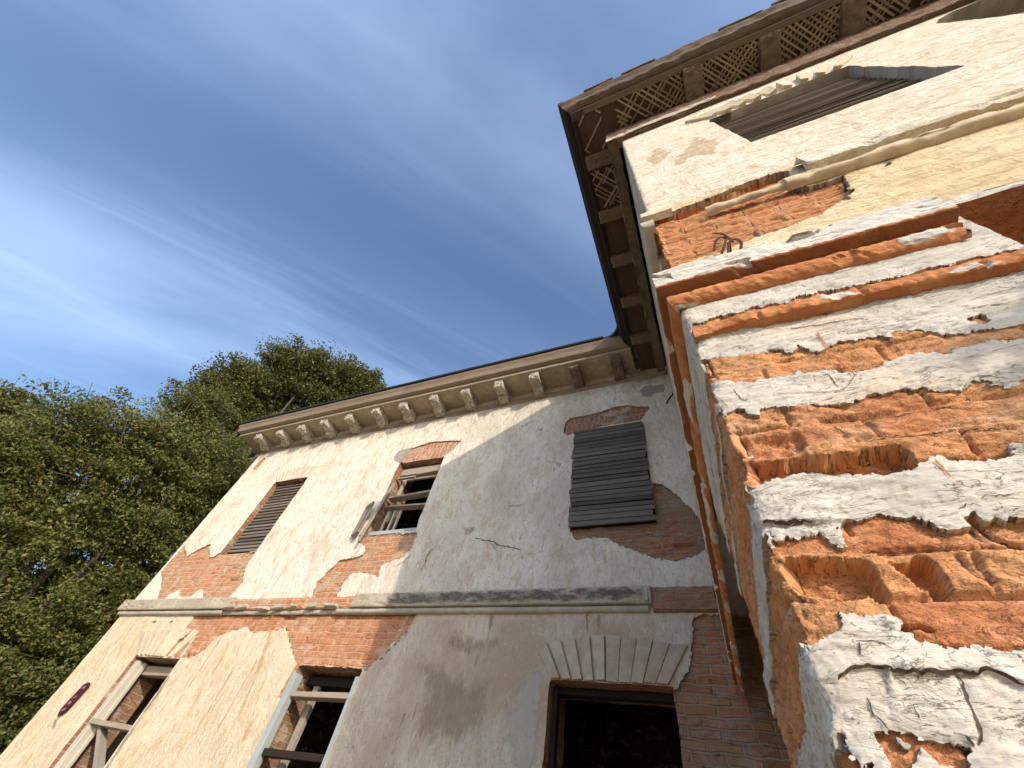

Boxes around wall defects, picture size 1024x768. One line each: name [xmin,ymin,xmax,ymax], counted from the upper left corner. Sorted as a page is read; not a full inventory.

flaking render [654,170,855,271]
flaking render [691,249,1024,330]
flaking render [564,384,665,435]
flaking render [394,440,461,463]
crack [476,538,521,550]
flaking render [570,482,705,562]
flaking render [674,313,1024,768]
flaking render [157,532,417,698]